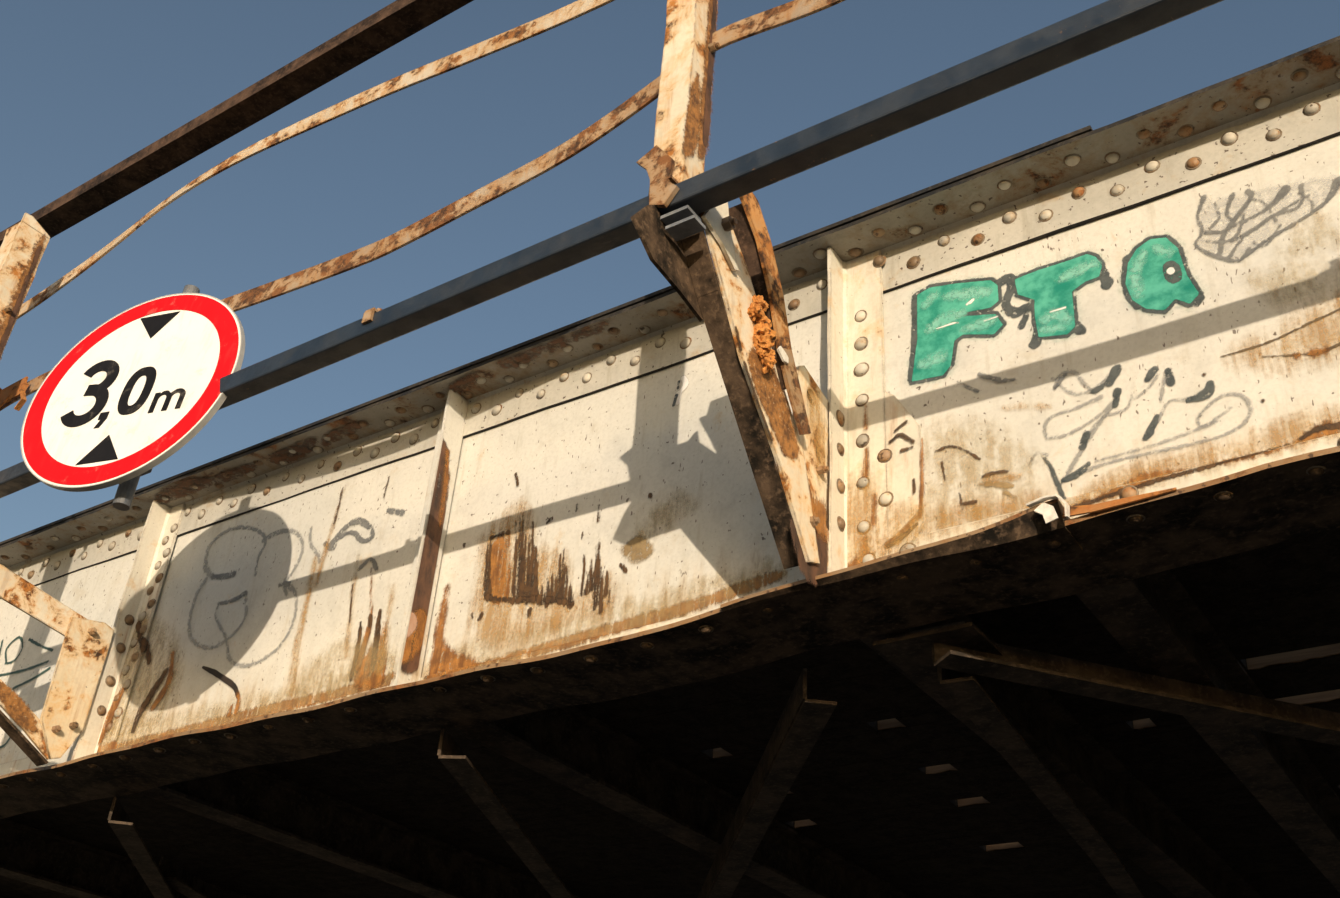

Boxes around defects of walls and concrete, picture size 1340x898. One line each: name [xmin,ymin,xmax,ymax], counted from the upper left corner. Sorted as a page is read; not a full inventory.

corrosion [682,0,718,159]
corrosion [0,234,46,358]
corrosion [735,326,799,459]
corrosion [847,420,925,567]
corrosion [1070,413,1340,507]
corrosion [97,393,830,753]
corrosion [0,682,38,732]